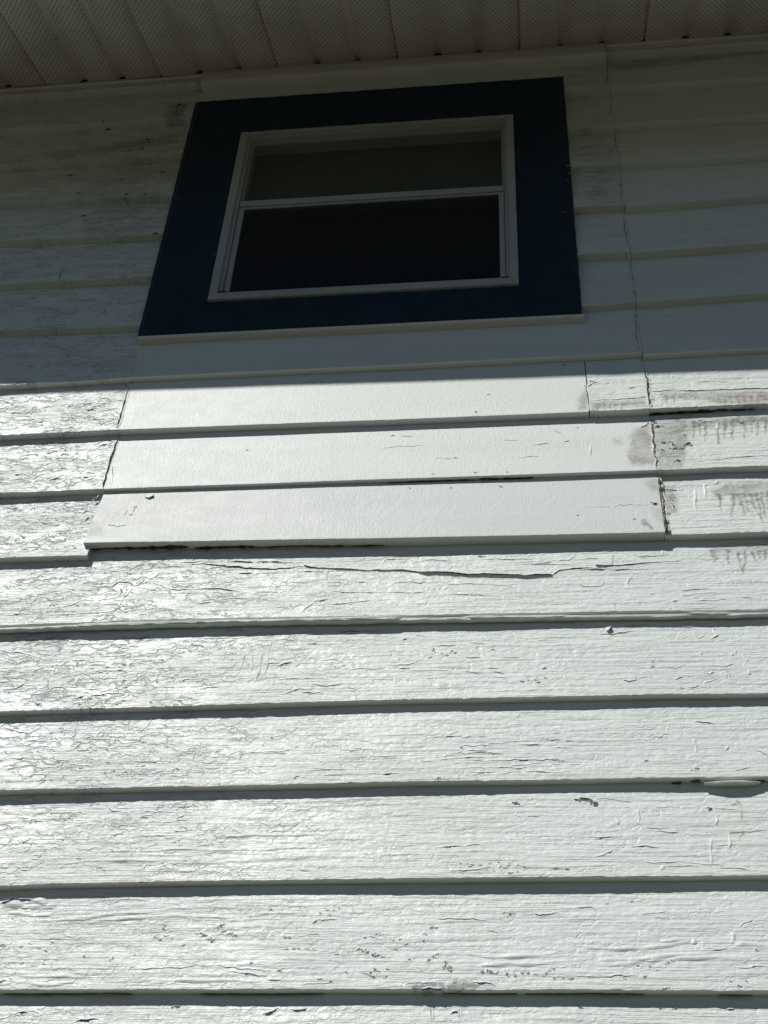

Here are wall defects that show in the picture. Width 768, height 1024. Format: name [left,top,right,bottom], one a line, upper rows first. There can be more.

crack [0,61,768,875]
peeling [577,554,613,587]
peeling [650,660,736,690]
peeling [194,923,238,944]
peeling [334,926,575,993]